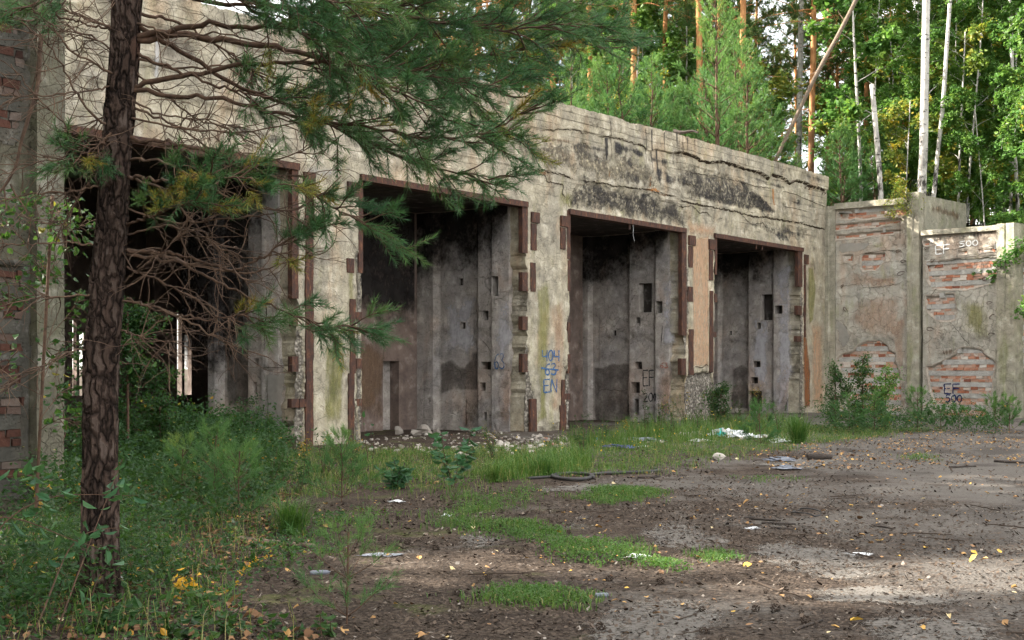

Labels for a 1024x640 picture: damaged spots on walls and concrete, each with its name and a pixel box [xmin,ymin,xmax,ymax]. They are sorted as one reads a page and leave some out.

flaking render [0,16,30,145]
crack [523,121,646,158]
crack [499,151,826,253]
damp [698,178,781,212]
flaking render [835,204,907,273]
flaking render [925,244,997,322]
flaking render [0,259,31,500]
flaking render [836,340,902,415]
flaking render [925,346,997,417]